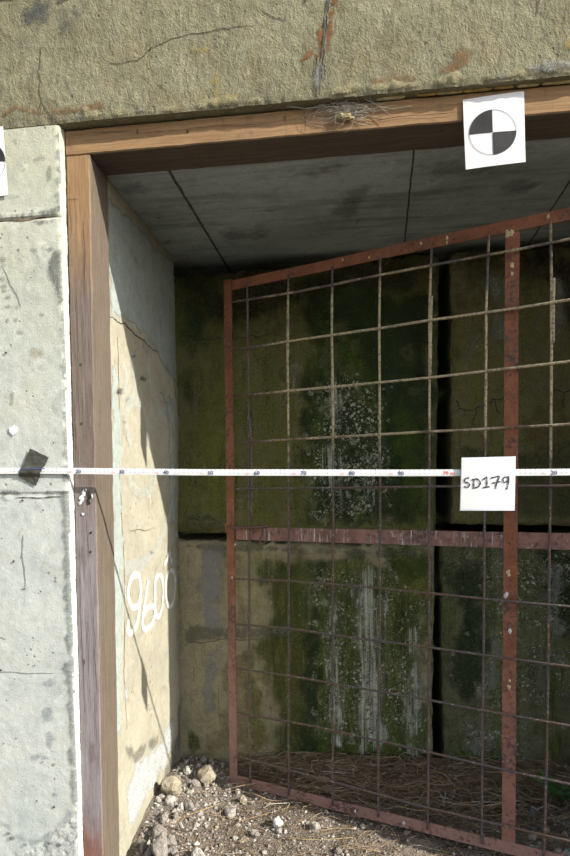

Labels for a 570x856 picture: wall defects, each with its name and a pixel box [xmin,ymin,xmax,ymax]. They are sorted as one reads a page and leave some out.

crack [117,10,283,64]
corrosion [301,0,338,60]
crack [314,0,332,93]
crack [454,388,570,428]
water stain [326,656,345,750]
water stain [351,565,389,754]
water stain [404,627,424,757]